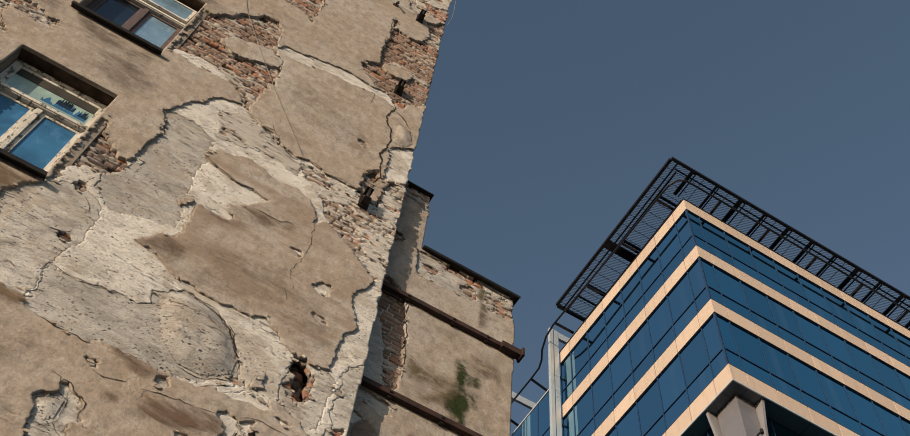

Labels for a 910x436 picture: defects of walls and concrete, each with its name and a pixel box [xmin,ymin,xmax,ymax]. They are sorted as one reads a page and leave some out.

crack [266,2,414,208]
peeling [0,0,452,436]
water stain [409,359,481,412]
peeling [416,251,513,320]